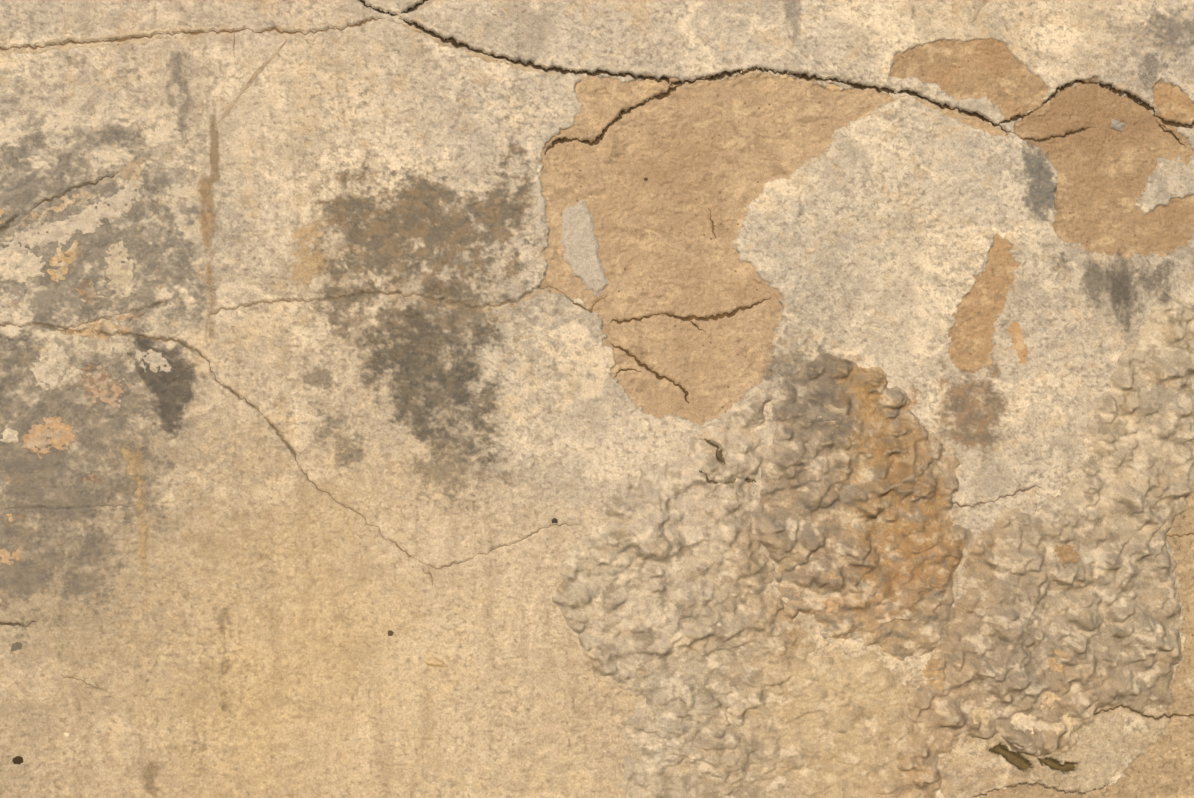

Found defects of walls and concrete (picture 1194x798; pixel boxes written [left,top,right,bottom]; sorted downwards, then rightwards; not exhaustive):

crack [0,172,119,231]
water stain [0,130,206,597]
crack [0,300,582,586]
water stain [315,144,532,463]
crack [208,283,772,404]
crack [0,0,1194,155]
spalling [536,70,895,425]
crack [699,439,756,484]
spalling [948,234,1029,373]
crack [950,485,1040,508]
spalling [889,38,1194,258]
spalling [973,482,1194,798]